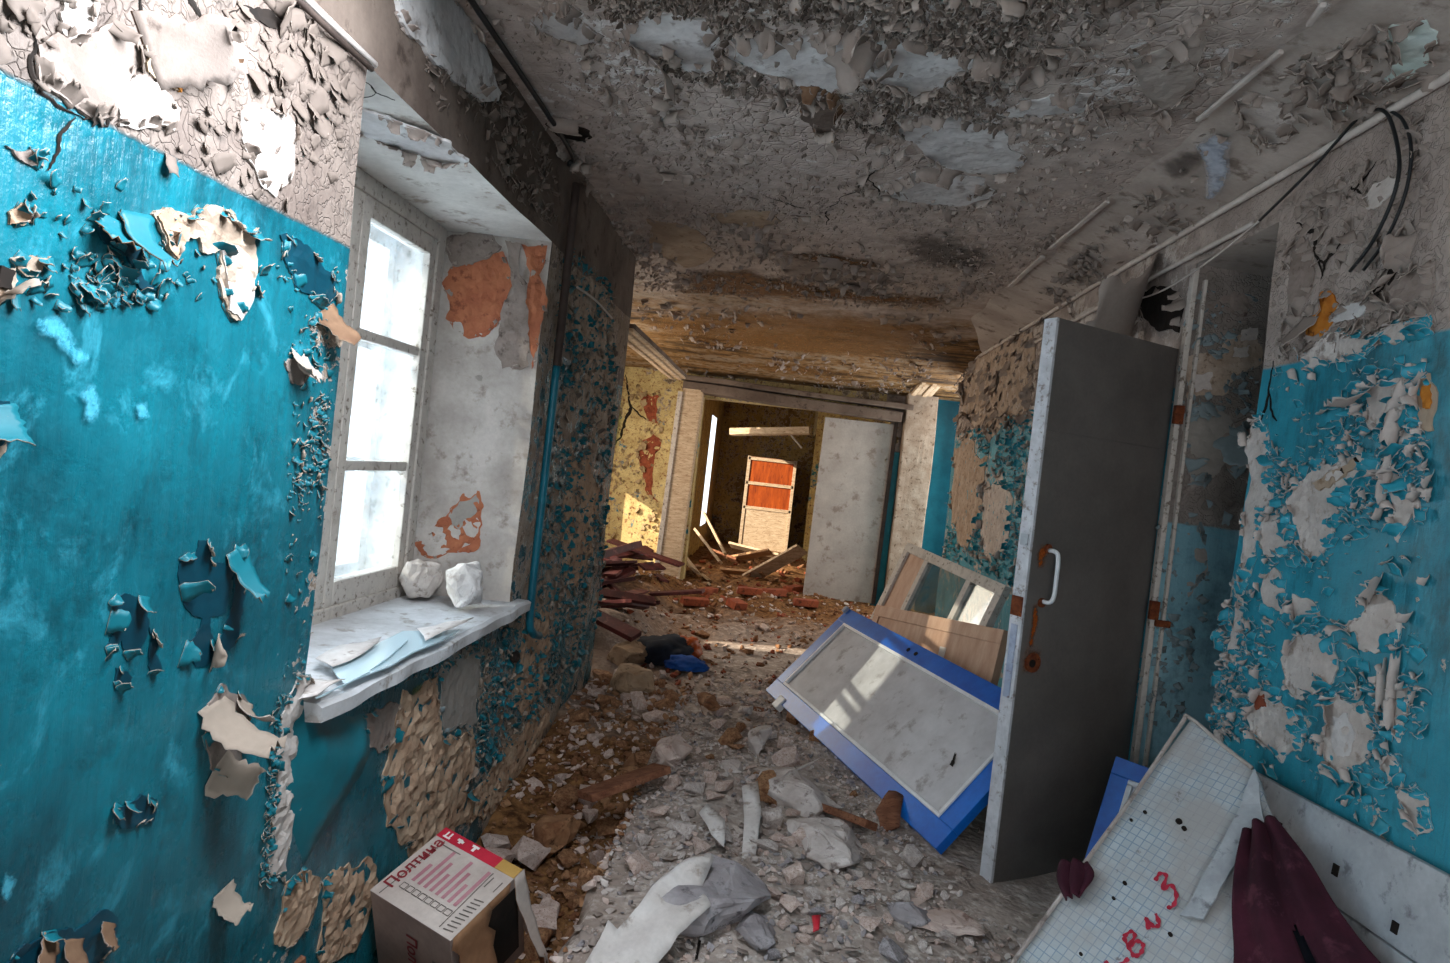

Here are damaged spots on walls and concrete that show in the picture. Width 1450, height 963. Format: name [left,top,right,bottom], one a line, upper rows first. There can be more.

water stain [796,254,877,267]
water stain [656,270,942,374]
peeling [0,0,1298,860]
peeling [211,879,254,926]
spalling [6,909,120,963]